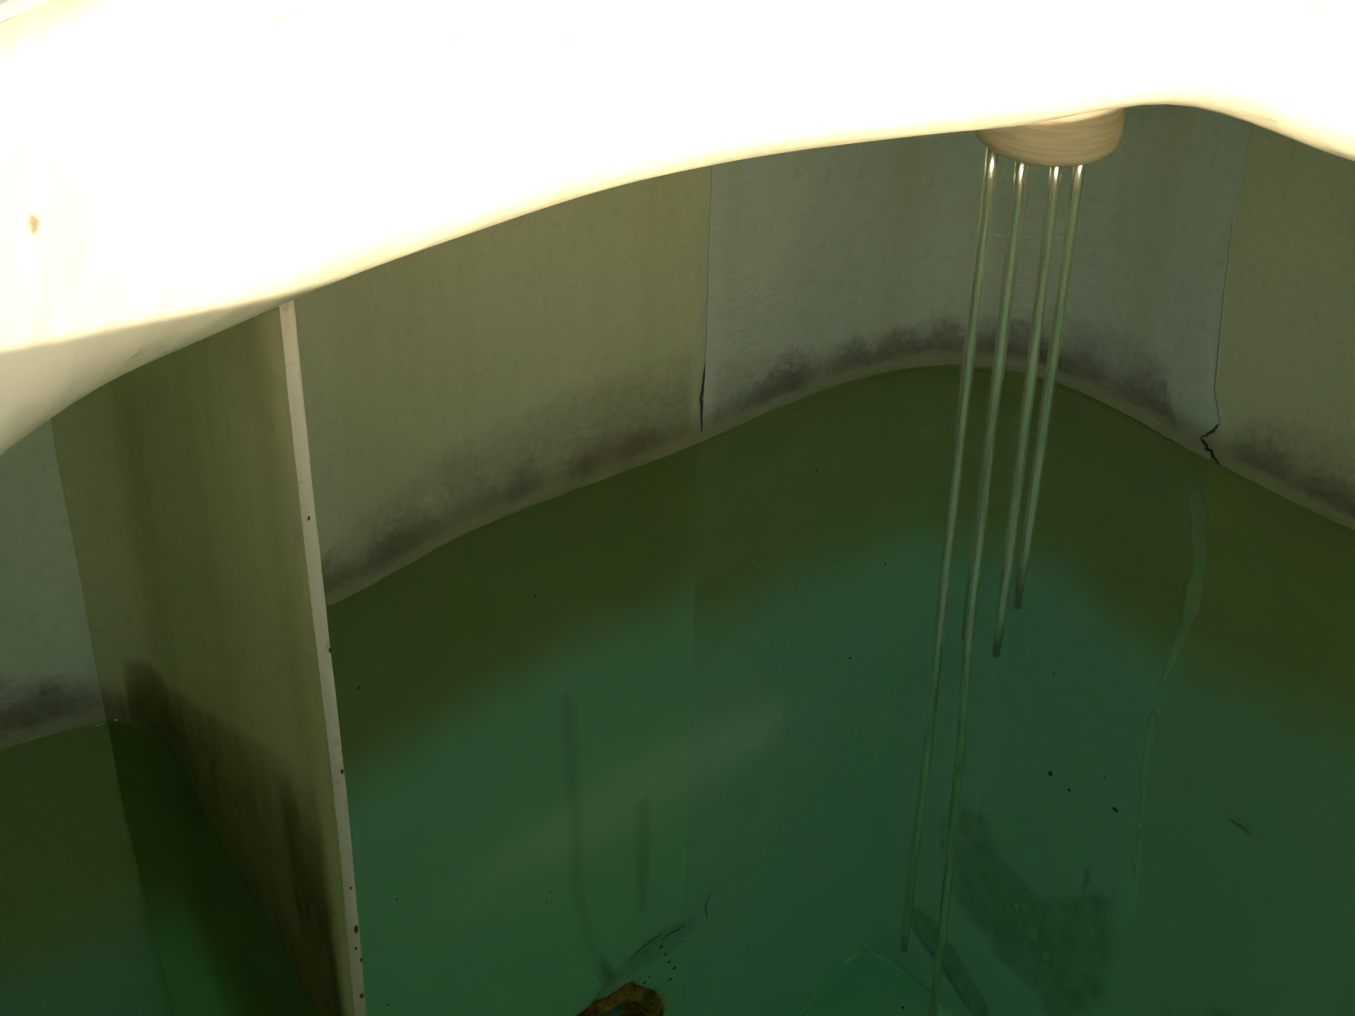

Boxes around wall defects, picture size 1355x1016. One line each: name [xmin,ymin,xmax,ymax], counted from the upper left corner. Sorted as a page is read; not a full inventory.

crack [700,165,712,445]
crack [1200,219,1233,464]